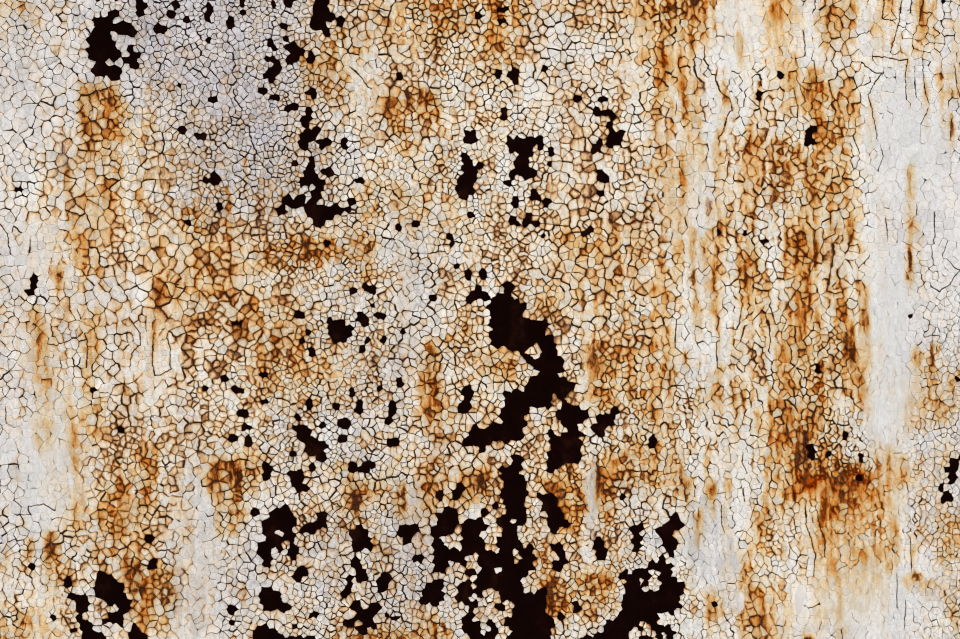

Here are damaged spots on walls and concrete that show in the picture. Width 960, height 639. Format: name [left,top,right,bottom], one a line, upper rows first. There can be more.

peeling [252,0,364,254]
crack [0,336,40,418]
corrosion [207,460,255,524]
peeling [219,372,408,639]
peeling [393,262,625,639]
peeling [580,512,690,639]
corrosion [786,216,818,356]
corrosion [769,393,870,538]
corrosion [843,309,869,395]
crack [893,586,960,638]
crack [901,315,960,577]
crack [907,213,960,311]